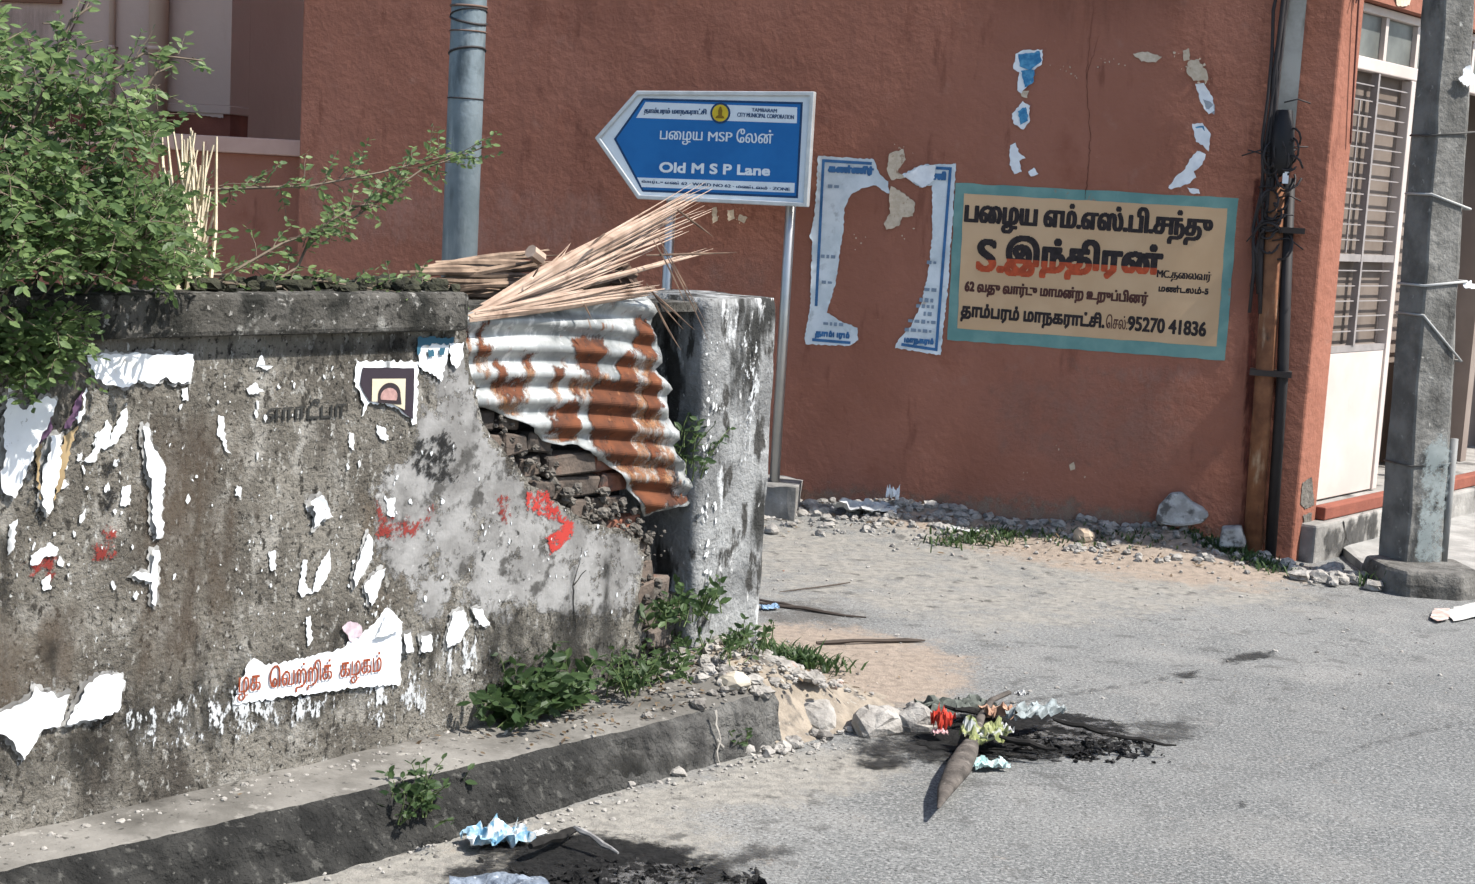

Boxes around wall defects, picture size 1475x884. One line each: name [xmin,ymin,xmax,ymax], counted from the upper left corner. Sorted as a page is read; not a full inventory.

damp [162,439,211,532]
peeling [346,419,361,470]
rust [465,317,688,514]
peeling [352,340,685,727]
damp [483,566,621,683]
damp [193,670,237,746]
damp [583,755,686,783]